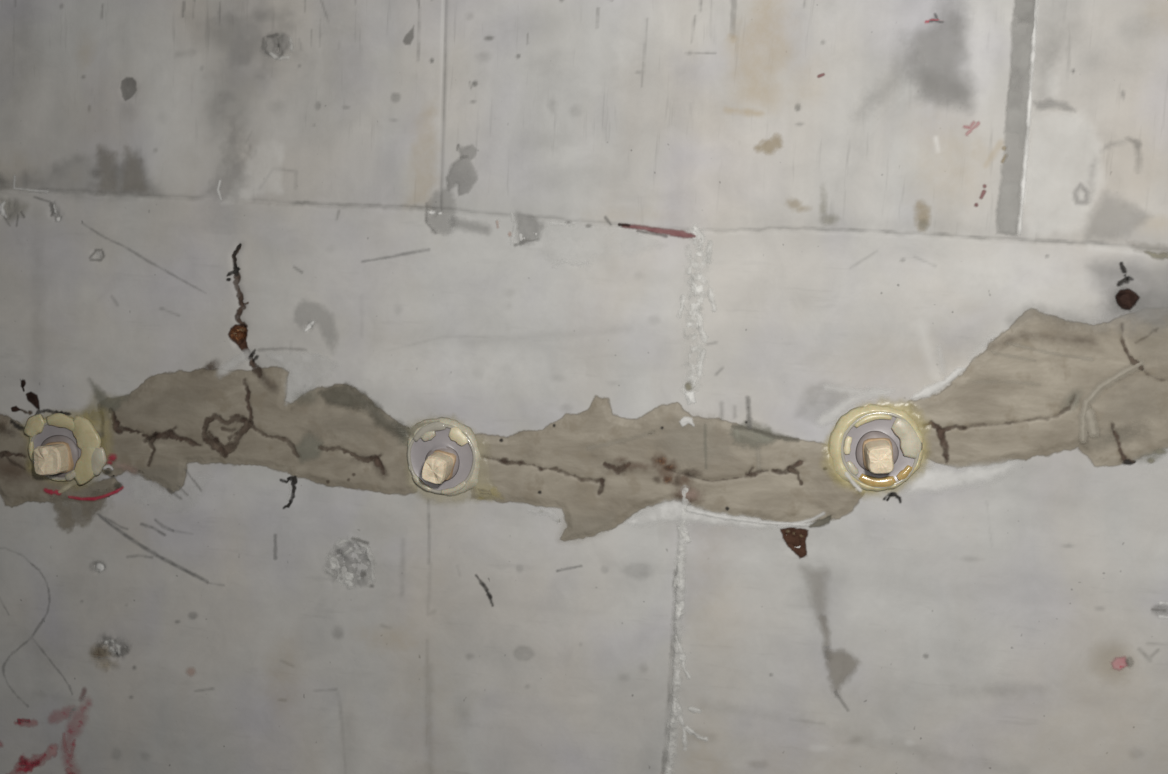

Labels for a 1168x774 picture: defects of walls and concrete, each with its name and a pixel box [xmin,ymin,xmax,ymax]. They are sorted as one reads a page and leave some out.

crack [1121,339,1143,369]
crack [111,244,384,508]
crack [0,409,70,467]
crack [923,421,966,460]
crack [1112,425,1134,464]
crack [482,439,630,494]
crack [746,461,827,485]
crack [884,492,901,503]